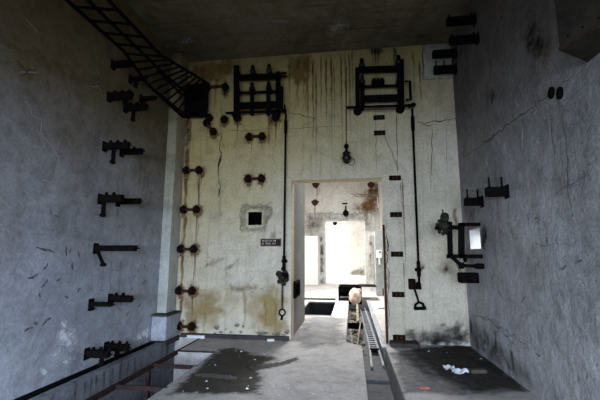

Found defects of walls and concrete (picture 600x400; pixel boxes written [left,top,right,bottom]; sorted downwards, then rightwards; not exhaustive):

crack [218,108,338,205]
crack [418,80,586,212]
rust [357,184,378,215]
rust [179,205,203,274]
water stain [175,348,298,393]
water stain [407,323,502,362]